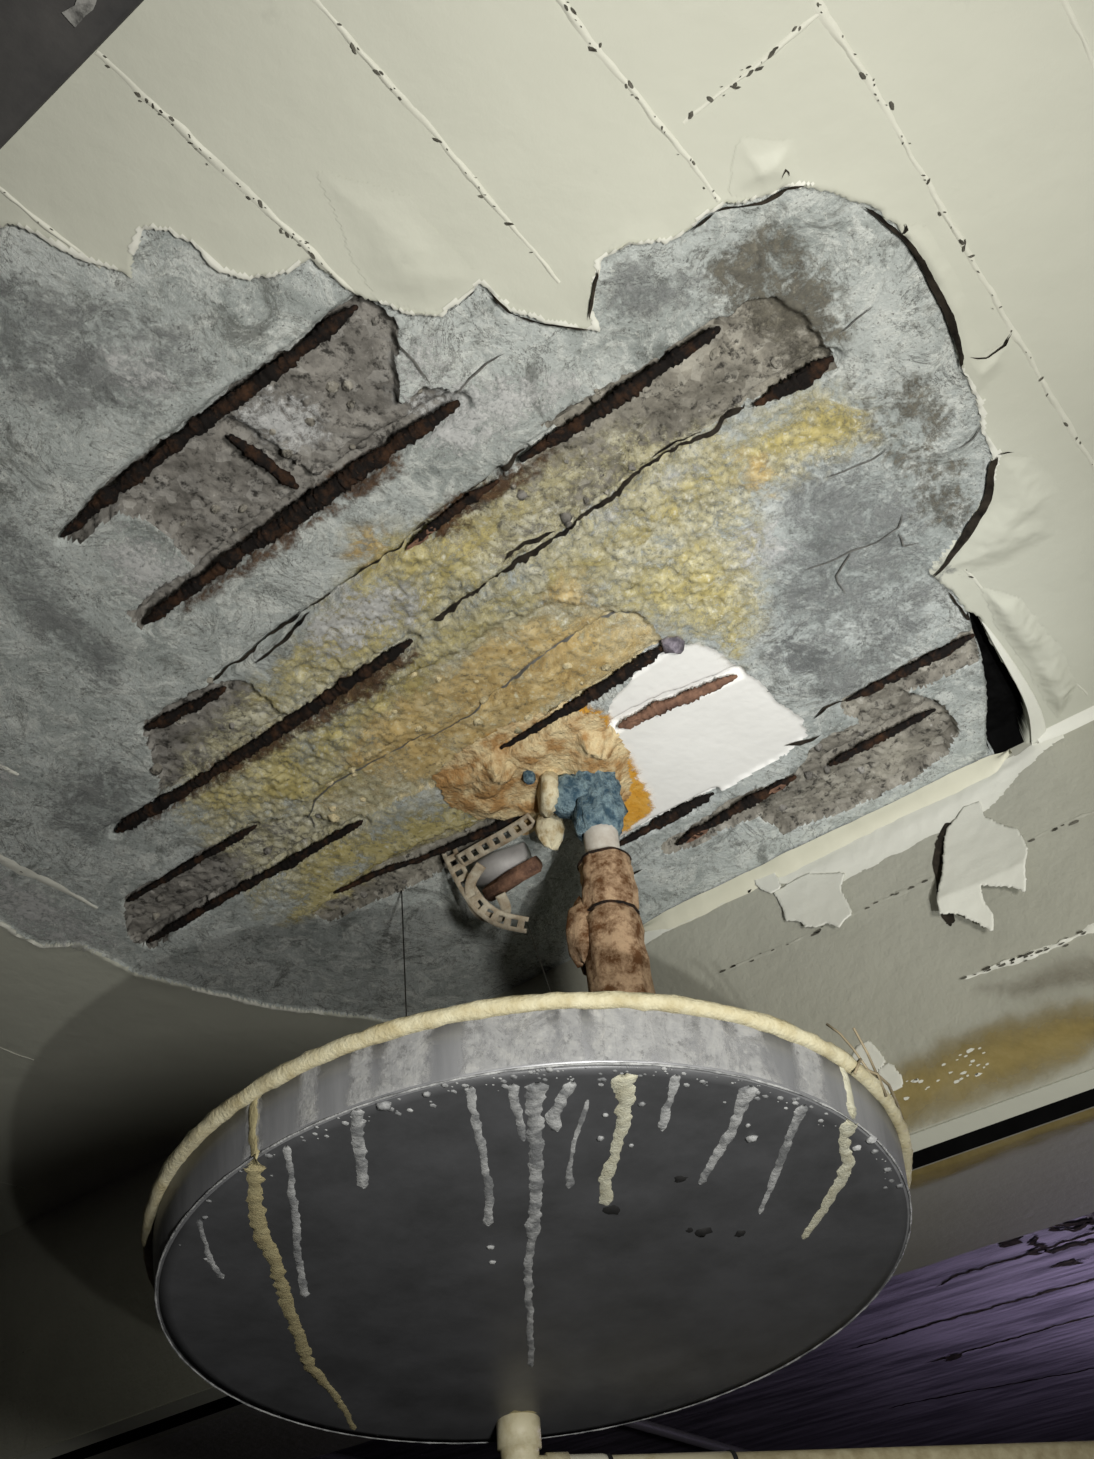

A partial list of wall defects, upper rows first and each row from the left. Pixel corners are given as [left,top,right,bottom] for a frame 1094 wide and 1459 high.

crack [692,169,804,231]
crack [865,207,1011,368]
leakage [397,341,580,456]
rust [429,449,552,537]
crack [213,521,427,681]
rust [144,577,649,826]
peeling [0,180,1064,1022]
leakage [173,377,970,922]
rust [622,757,654,833]
peeling [852,1040,903,1094]
leakage [876,1006,1094,1123]
leakage [910,1108,1094,1188]